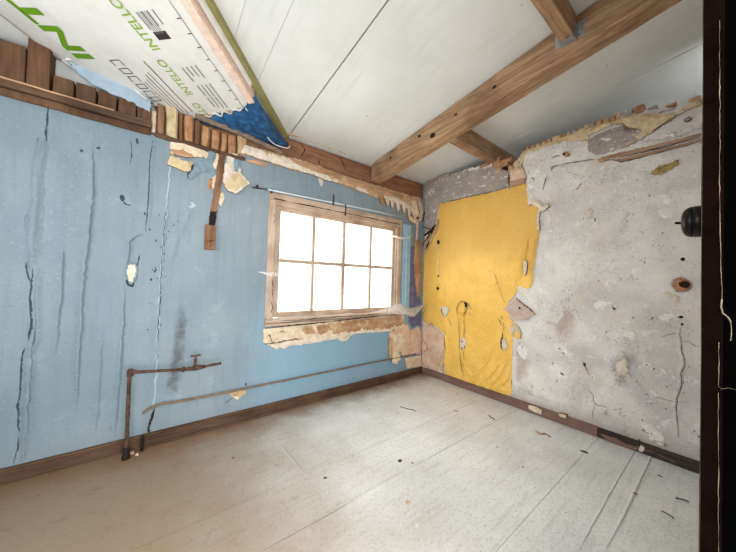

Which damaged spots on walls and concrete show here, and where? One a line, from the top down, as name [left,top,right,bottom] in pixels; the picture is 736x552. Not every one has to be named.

flaking render [522,98,702,153]
flaking render [167,142,421,217]
flaking render [509,167,527,181]
spalling [124,255,140,287]
flaking render [263,310,445,373]
crack [657,327,699,438]